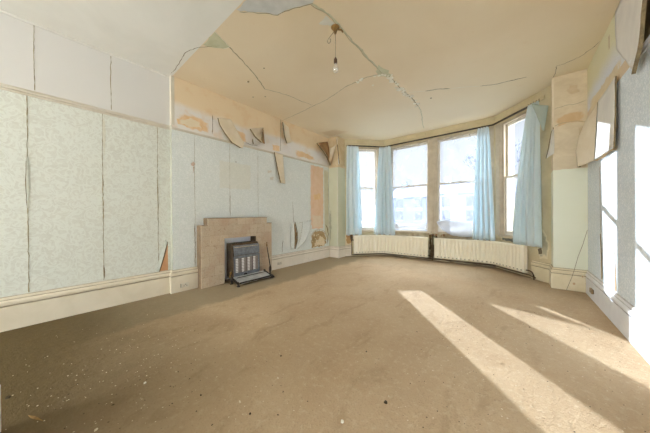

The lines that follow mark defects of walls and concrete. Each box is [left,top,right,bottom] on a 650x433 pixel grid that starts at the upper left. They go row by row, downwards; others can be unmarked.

peeling [236,0,315,16]
crack [229,4,525,128]
peeling [588,0,643,115]
peeling [271,143,329,249]
peeling [157,240,168,272]